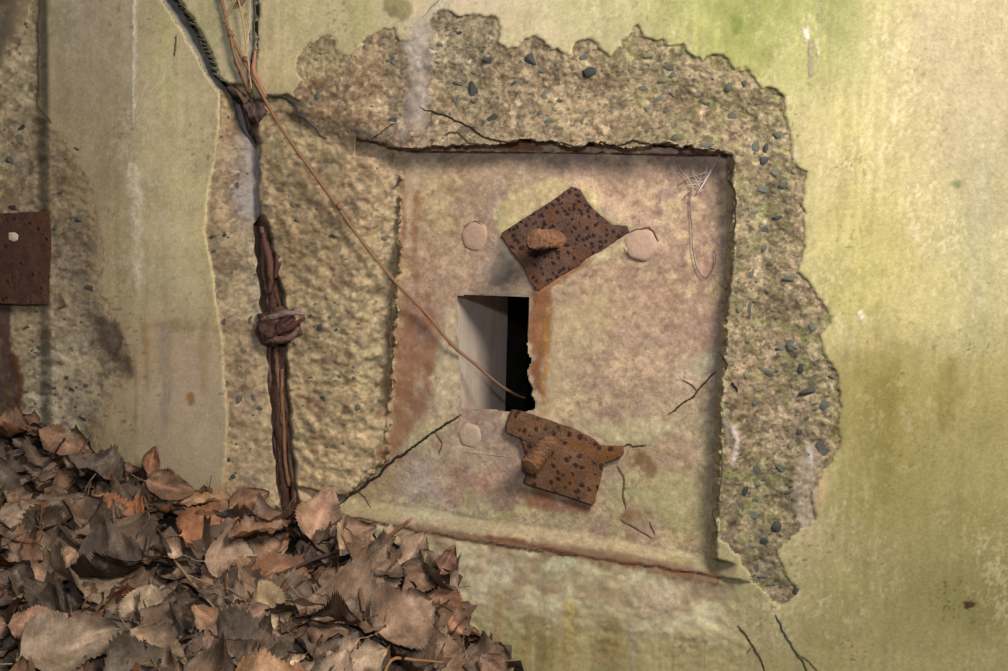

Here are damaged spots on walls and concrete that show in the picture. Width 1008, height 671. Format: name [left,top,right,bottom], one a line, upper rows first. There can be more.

crack [163,0,328,139]
crack [367,123,394,145]
crack [420,107,737,231]
rust [0,304,25,409]
spalling [205,0,842,608]
rust [528,261,587,396]
crack [339,414,462,507]
water stain [795,445,824,523]
rust [420,529,719,585]
crack [738,626,765,671]
crack [775,614,819,671]